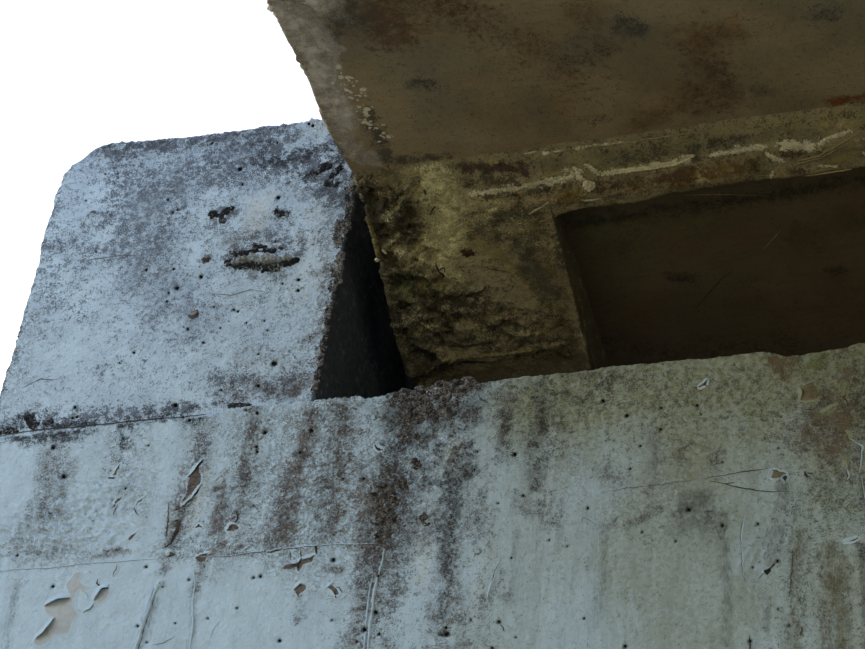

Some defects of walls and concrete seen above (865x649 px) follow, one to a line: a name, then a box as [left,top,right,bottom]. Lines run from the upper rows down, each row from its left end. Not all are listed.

water stain [266,0,381,165]
spalling [224,243,300,274]
water stain [318,129,865,649]
peeling [165,503,181,547]
water stain [168,460,206,546]
peeling [180,458,207,507]
water stain [210,406,257,535]
water stain [266,408,318,548]
crack [606,468,789,492]
peeling [32,570,111,648]
peeling [264,546,317,599]
peeling [325,581,343,598]